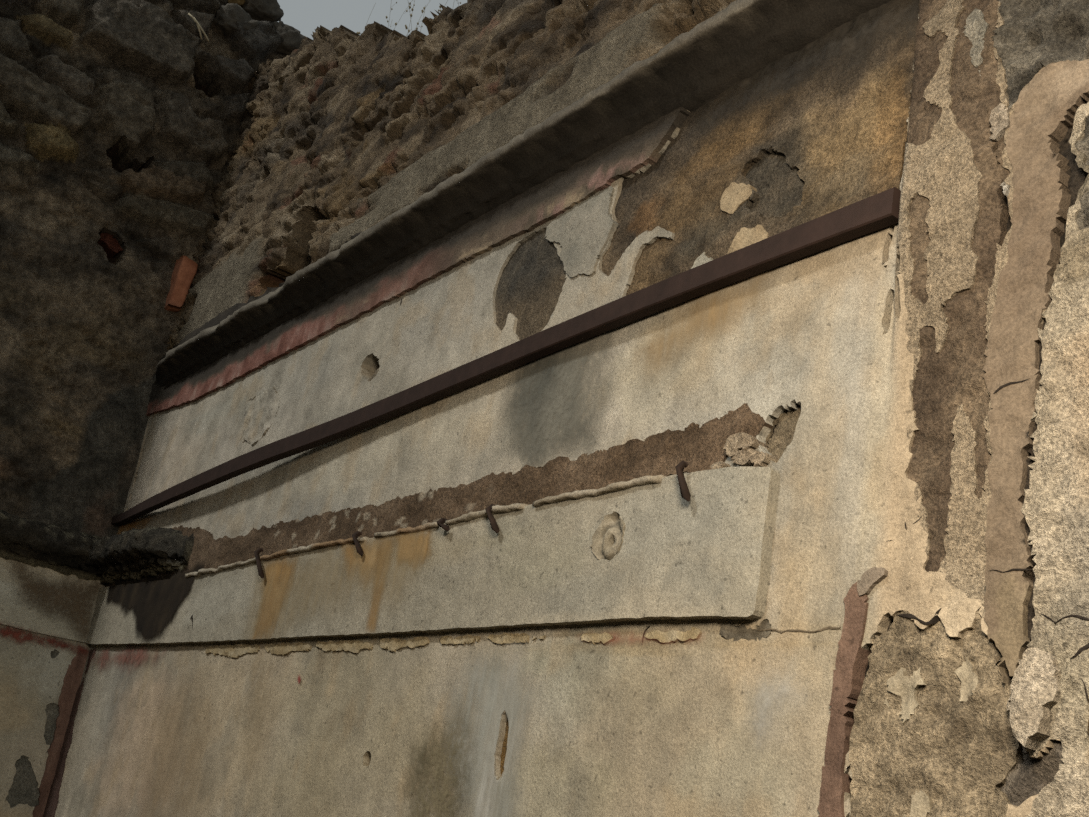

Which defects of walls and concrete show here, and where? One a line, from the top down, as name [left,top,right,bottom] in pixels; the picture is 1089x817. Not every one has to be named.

flaking render [495,0,1089,572]
crack [993,320,1046,394]
corrosion [254,560,294,638]
peeling [205,633,546,658]
corrosion [343,532,429,628]
peeling [580,632,615,645]
peeling [644,627,702,643]
crack [989,422,1089,735]
flaking render [6,755,40,808]
spalling [500,717,509,775]
flaking render [849,609,1023,817]